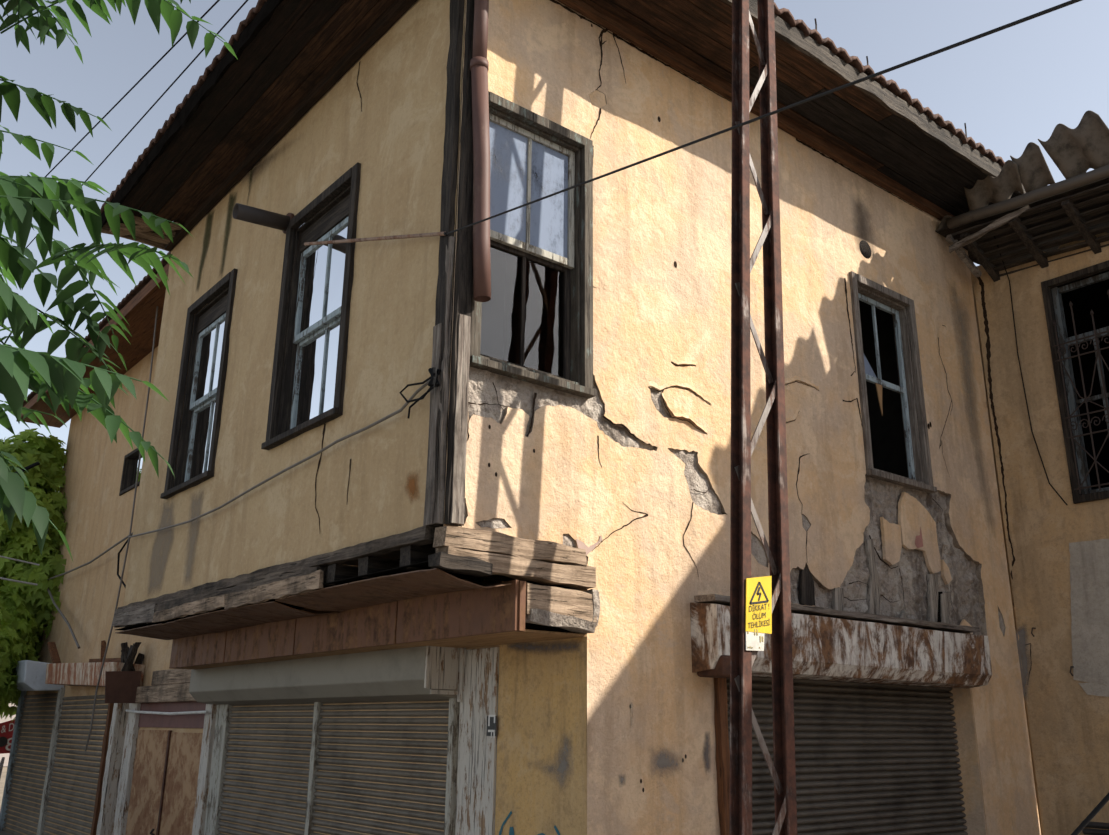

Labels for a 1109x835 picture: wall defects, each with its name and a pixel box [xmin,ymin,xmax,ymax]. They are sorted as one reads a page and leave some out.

crack [550,0,731,157]
crack [796,138,923,212]
peeling [671,357,696,366]
spalling [467,366,726,515]
crack [796,454,807,505]
crack [592,503,648,551]
crack [683,502,699,577]
spalling [790,474,1006,636]